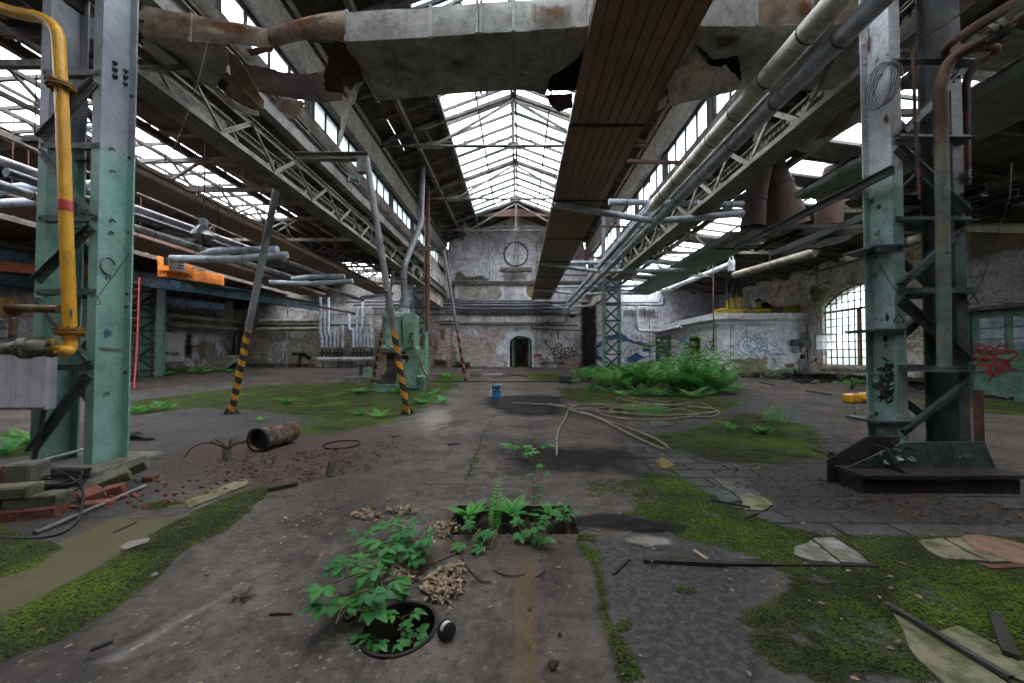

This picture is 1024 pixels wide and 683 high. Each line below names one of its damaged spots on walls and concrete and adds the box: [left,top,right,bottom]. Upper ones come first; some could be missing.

corrosion [205,16,247,34]
peeling [872,336,895,418]